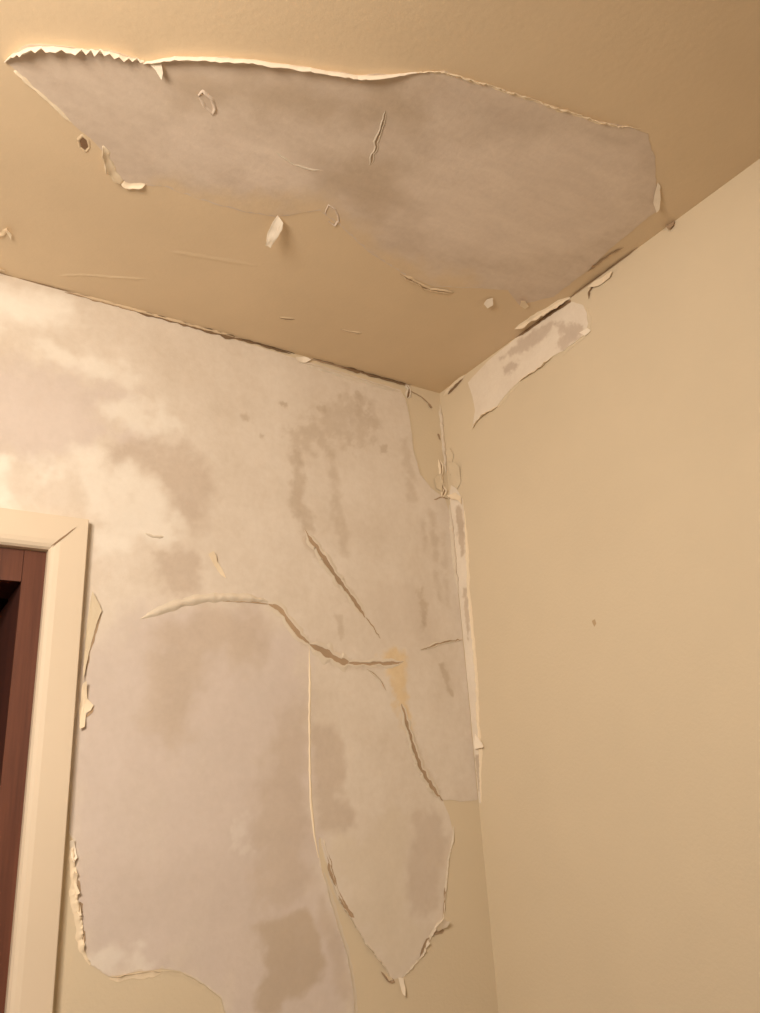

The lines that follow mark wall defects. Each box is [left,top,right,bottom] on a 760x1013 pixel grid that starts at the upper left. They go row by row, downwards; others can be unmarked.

peeling [4,44,661,309]
peeling [468,302,591,429]
water stain [0,345,360,1013]
crack [140,529,462,801]
water stain [258,379,471,698]